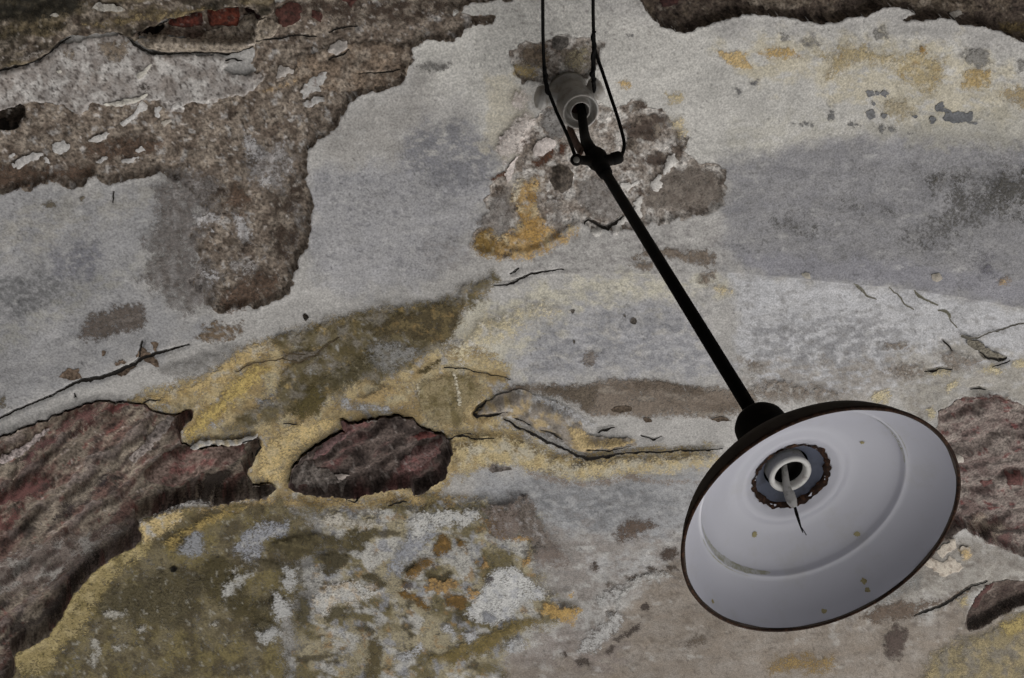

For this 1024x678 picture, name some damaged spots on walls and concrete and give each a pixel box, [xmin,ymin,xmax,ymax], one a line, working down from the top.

crack [0,36,71,72]
crack [119,25,400,74]
spalling [640,0,1024,48]
spalling [0,0,512,344]
spalling [472,34,727,259]
crack [0,341,190,419]
damp [13,174,742,678]
crack [446,401,723,461]
crack [854,284,1024,390]
spalling [925,394,1024,577]
spalling [0,400,453,678]
spalling [966,579,1024,632]